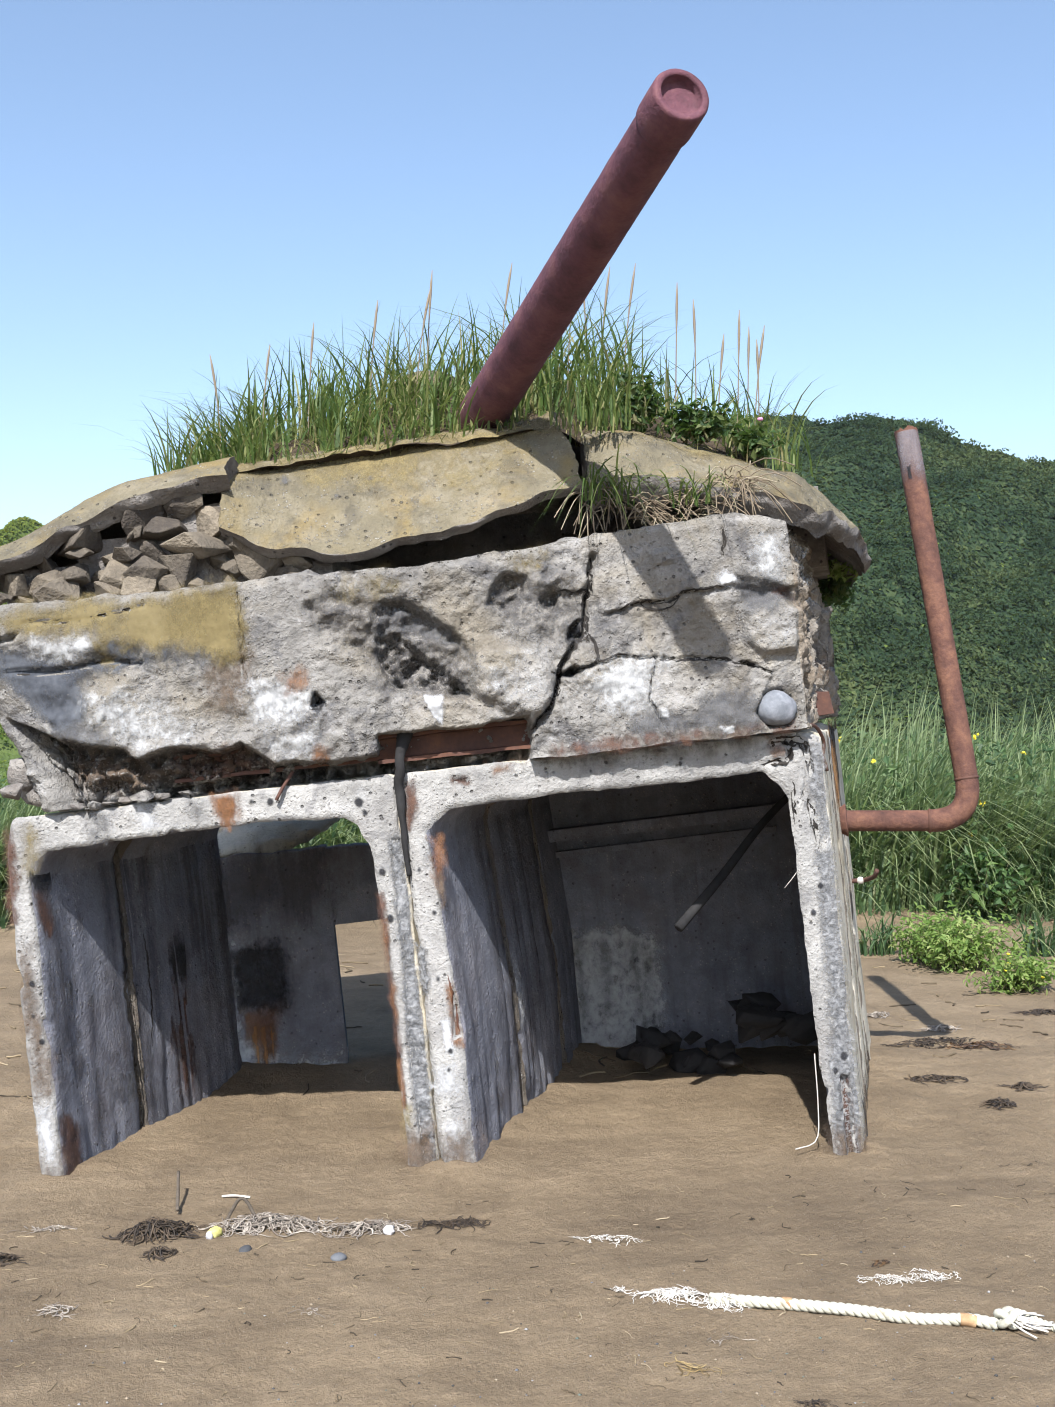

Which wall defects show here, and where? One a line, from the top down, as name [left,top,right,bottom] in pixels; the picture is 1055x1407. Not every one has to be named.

crack [531,528,772,731]
corrosion [213,795,234,826]
corrosion [828,722,840,813]
corrosion [60,1115,80,1175]